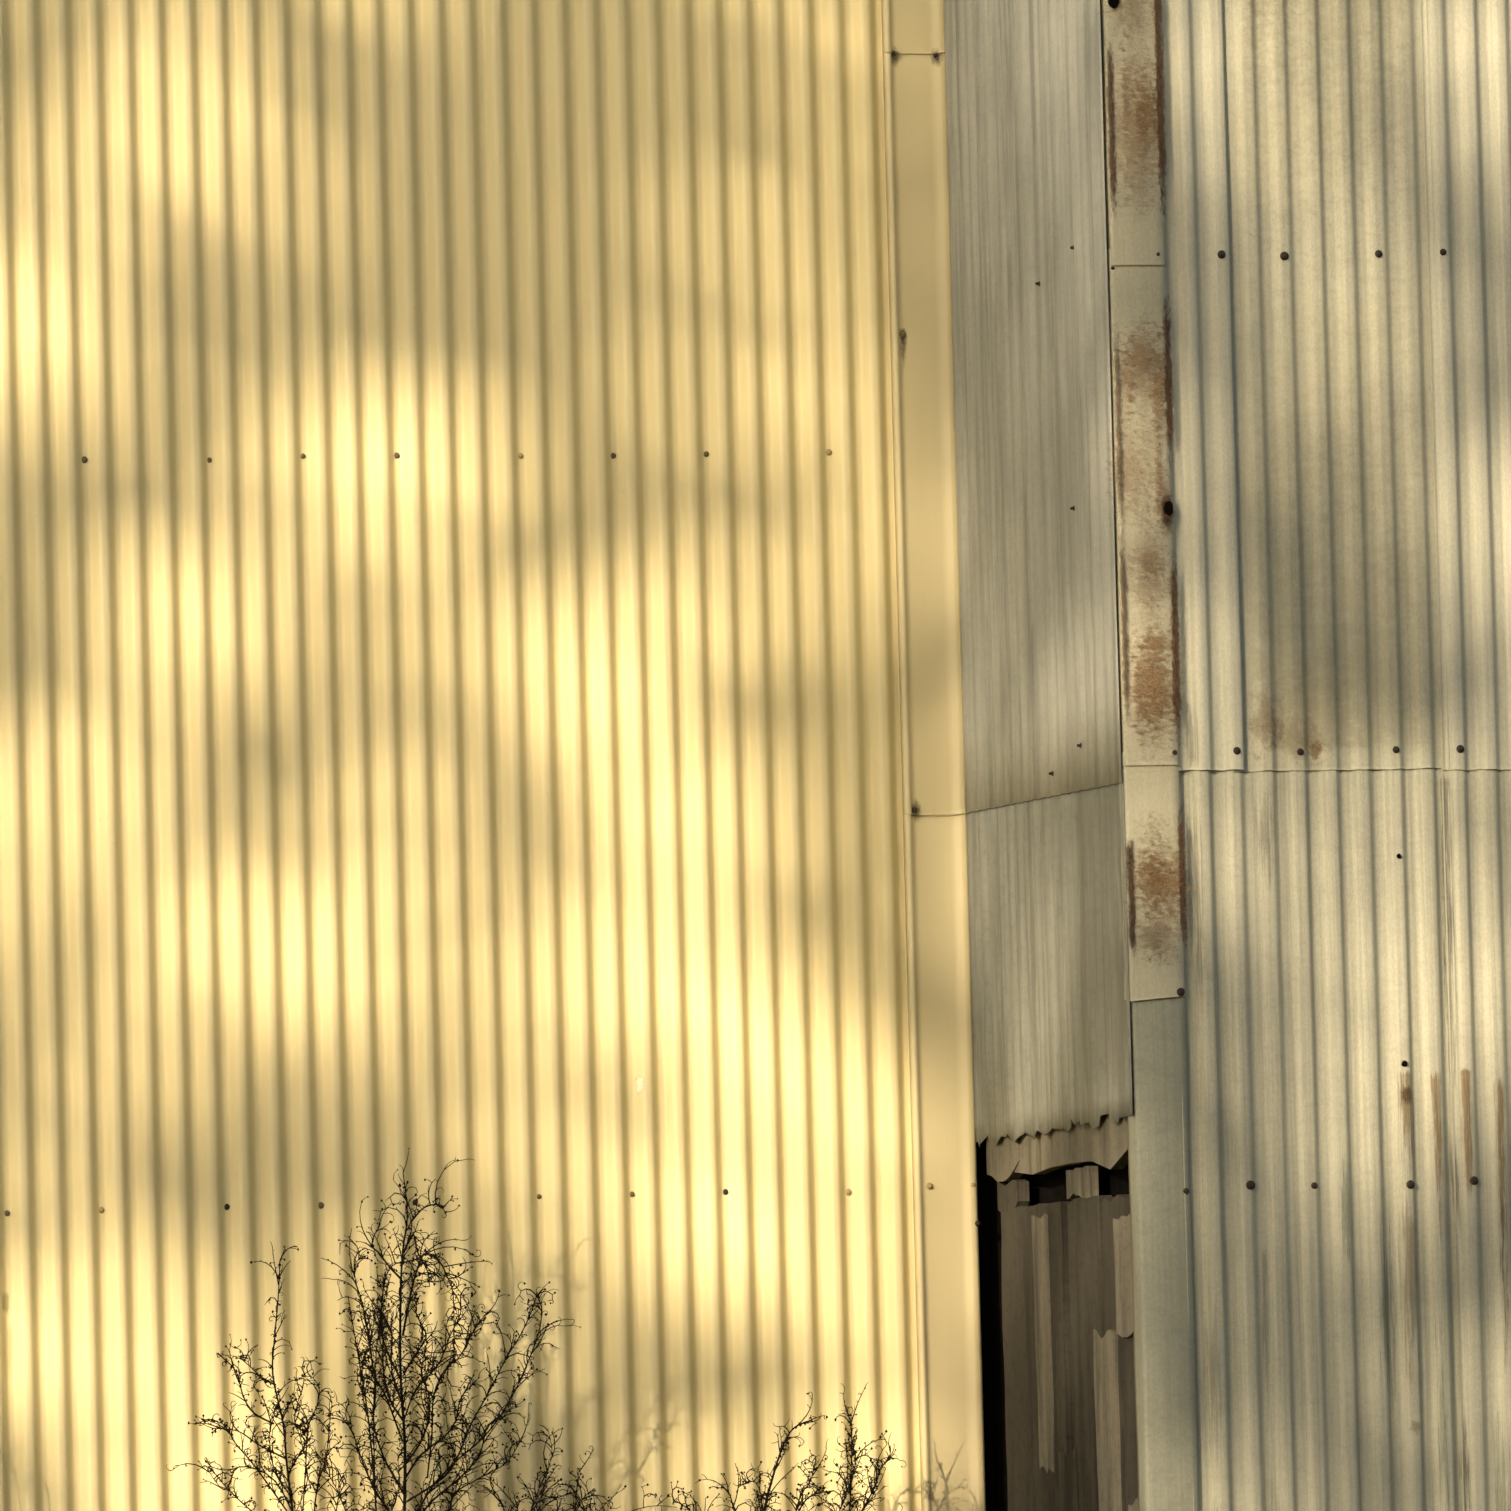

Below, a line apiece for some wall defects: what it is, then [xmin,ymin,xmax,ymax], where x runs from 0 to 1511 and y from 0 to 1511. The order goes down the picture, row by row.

rust [1106,50,1116,206]
rust [1132,0,1166,214]
rust [1114,299,1174,535]
rust [1120,539,1182,744]
rust [1126,813,1188,947]
rust [1400,1072,1413,1161]
rust [1431,1074,1441,1218]
rust [1461,1070,1472,1190]
rust [1498,1082,1509,1324]